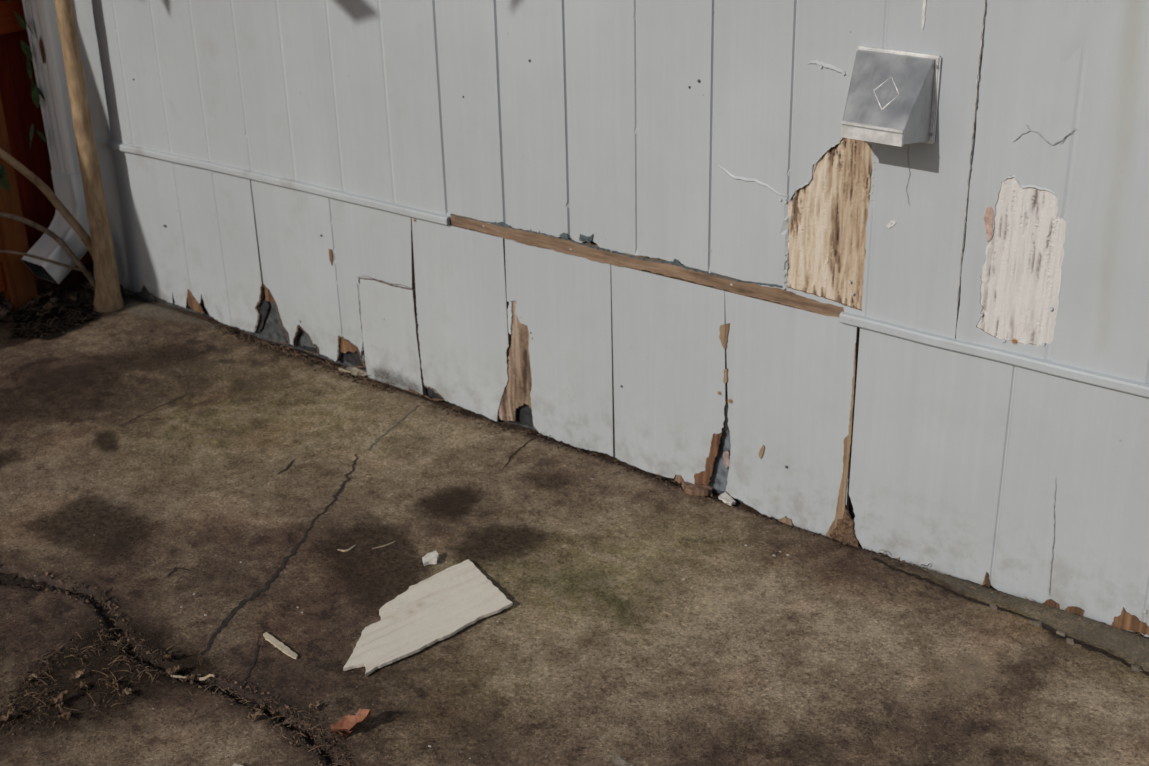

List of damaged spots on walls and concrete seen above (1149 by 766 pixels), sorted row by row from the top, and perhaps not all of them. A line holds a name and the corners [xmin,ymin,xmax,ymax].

peeling [450,138,872,310]
peeling [977,175,1067,346]
spalling [254,284,319,355]
spalling [337,336,366,368]
peeling [719,323,730,349]
spalling [516,403,533,426]
spalling [709,430,736,506]
peeling [825,343,860,548]
leakage [32,496,151,555]
leakage [457,525,544,561]
crack [0,405,418,766]
peeling [1111,607,1149,635]